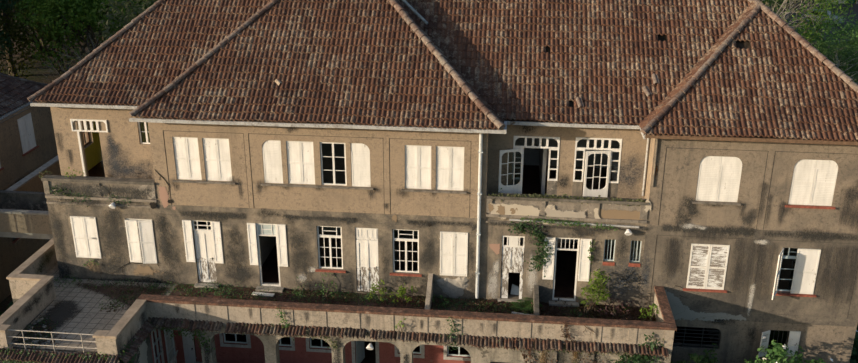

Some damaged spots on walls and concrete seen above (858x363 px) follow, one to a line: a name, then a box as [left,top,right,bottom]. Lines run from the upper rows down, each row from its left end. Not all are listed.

damp [14,136,180,323]
damp [180,212,245,221]
damp [224,230,253,281]
damp [258,209,357,291]
peeling [488,198,652,224]
damp [663,183,858,315]
peeling [665,289,746,321]